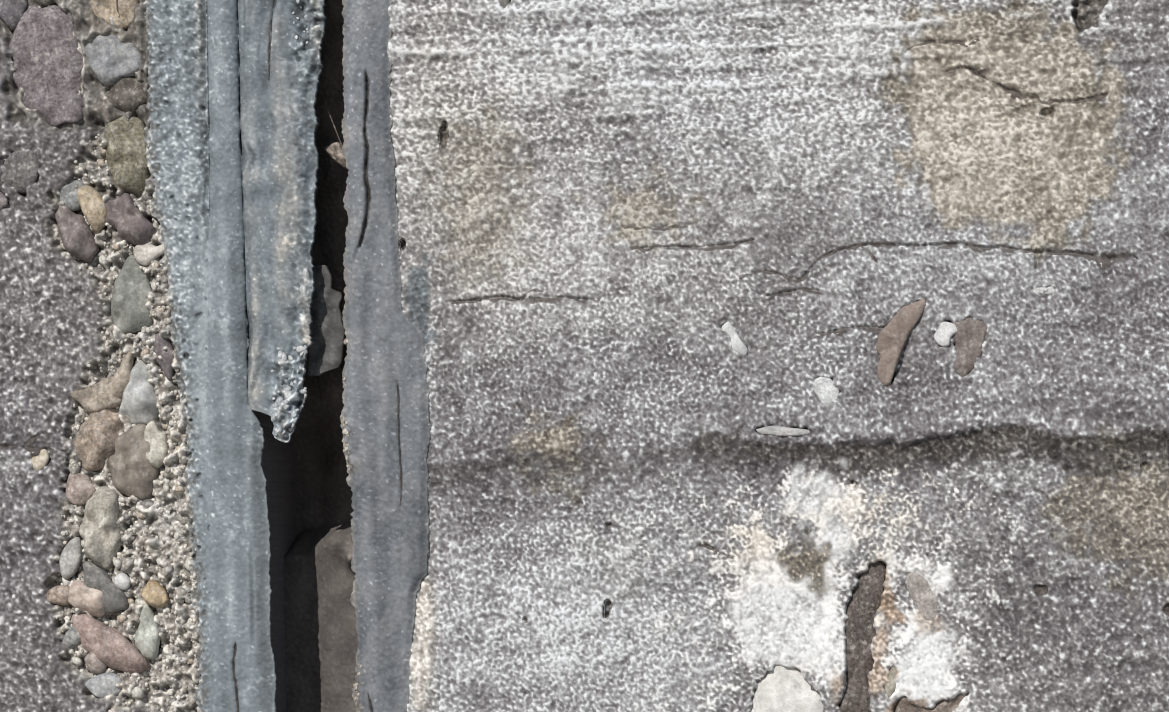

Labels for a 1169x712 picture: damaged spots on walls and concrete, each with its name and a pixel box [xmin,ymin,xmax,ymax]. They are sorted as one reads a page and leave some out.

crack [267,0,275,80]
crack [907,38,1105,105]
spalling [1072,0,1108,31]
crack [359,72,370,246]
damp [880,0,1129,258]
peeling [299,268,310,298]
crack [625,224,752,253]
crack [739,241,1126,299]
damp [566,425,1169,712]